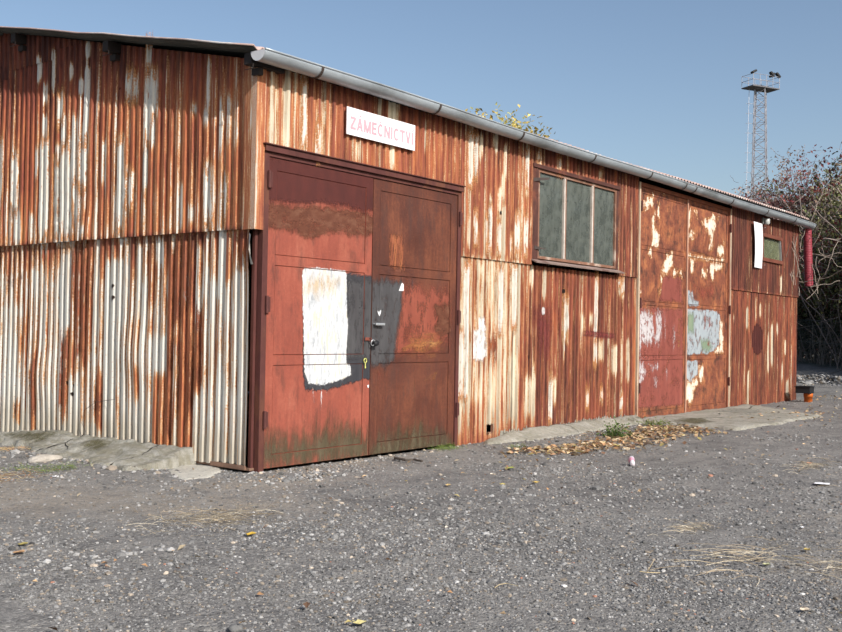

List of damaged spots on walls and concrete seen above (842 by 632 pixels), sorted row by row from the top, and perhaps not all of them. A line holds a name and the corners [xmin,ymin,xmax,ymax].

rust [268,157,374,239]
peeling [642,192,665,259]
peeling [658,250,725,296]
rust [58,234,94,413]
rust [166,236,204,442]
rust [404,303,452,351]
rust [488,331,498,362]
peeling [714,320,724,356]
rust [752,324,763,354]
rust [94,387,103,424]